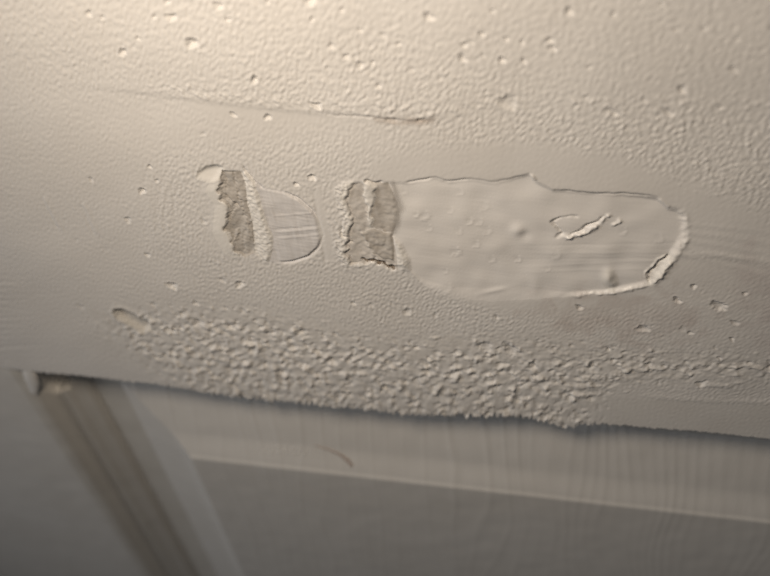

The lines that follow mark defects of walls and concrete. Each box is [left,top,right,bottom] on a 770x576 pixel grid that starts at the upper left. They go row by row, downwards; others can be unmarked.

peeling [195,163,321,264]
peeling [339,174,689,312]